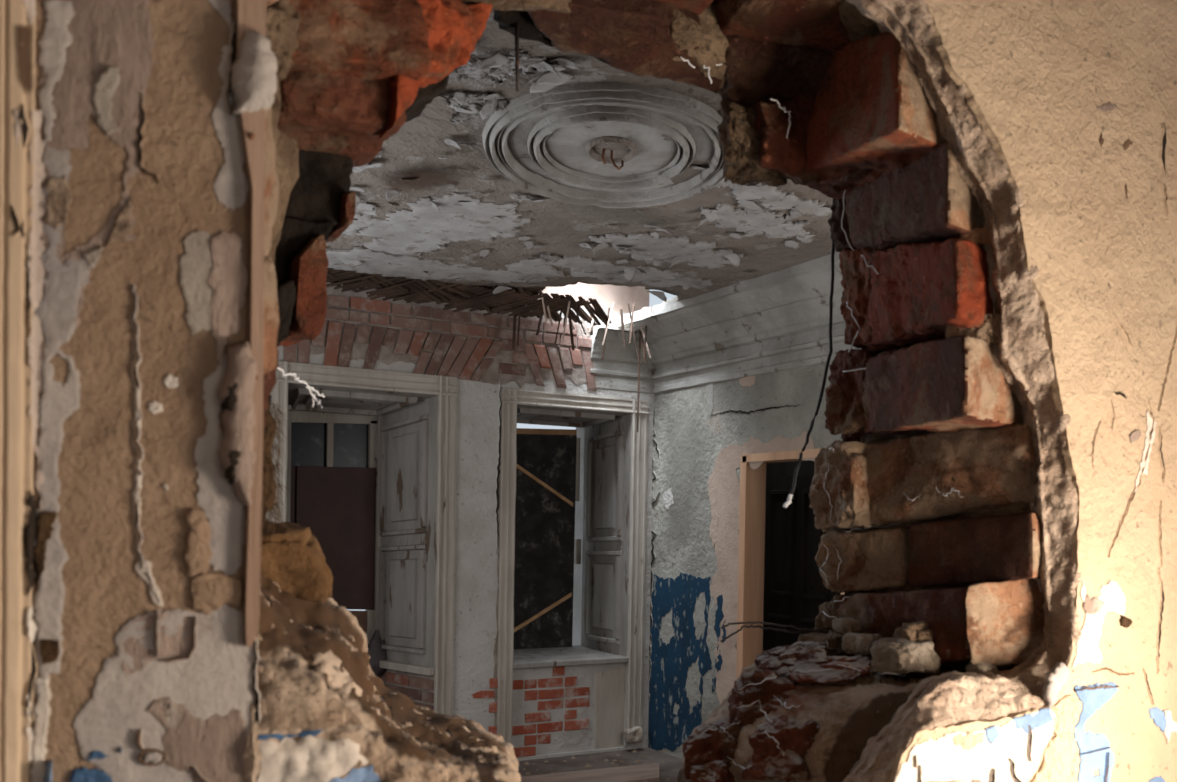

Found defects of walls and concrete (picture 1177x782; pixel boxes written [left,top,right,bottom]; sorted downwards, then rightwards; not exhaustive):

peeling [9,0,155,782]
crack [130,284,164,606]
crack [135,93,160,184]
peeling [179,230,257,575]
peeling [209,0,250,210]
peeling [69,481,593,782]
peeling [436,48,579,125]
flaking render [284,138,832,391]
crack [710,404,800,416]
flaking render [648,0,1132,782]
crack [1091,327,1177,705]
crack [1159,124,1169,217]